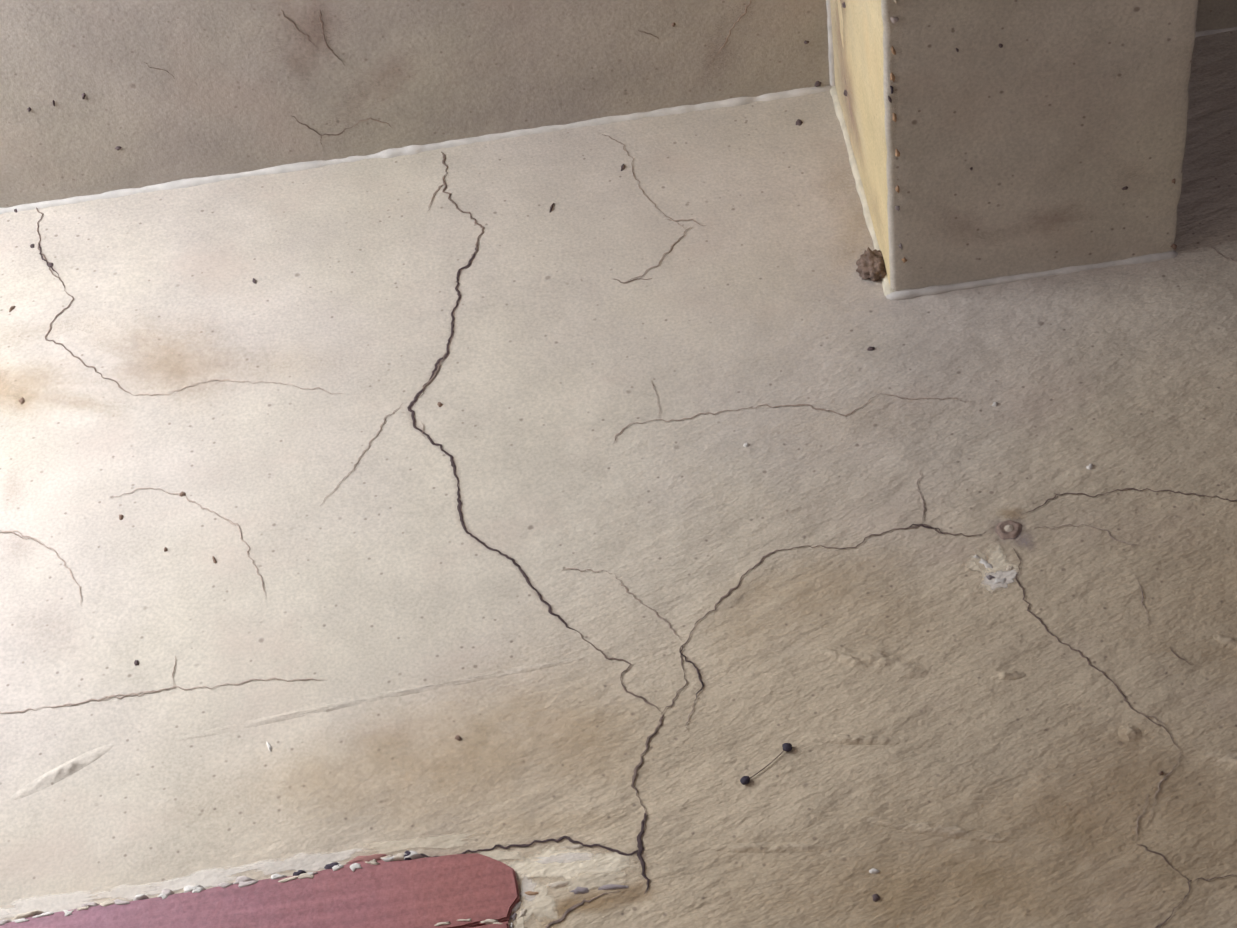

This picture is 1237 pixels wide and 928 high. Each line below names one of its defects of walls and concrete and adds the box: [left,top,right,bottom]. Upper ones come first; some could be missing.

crack [36,207,341,396]
crack [0,530,82,606]
crack [112,488,265,597]
crack [321,133,984,928]
spalling [967,545,1020,593]
crack [0,657,325,713]
crack [1012,488,1237,928]
peeling [0,834,468,925]
spalling [434,845,633,928]